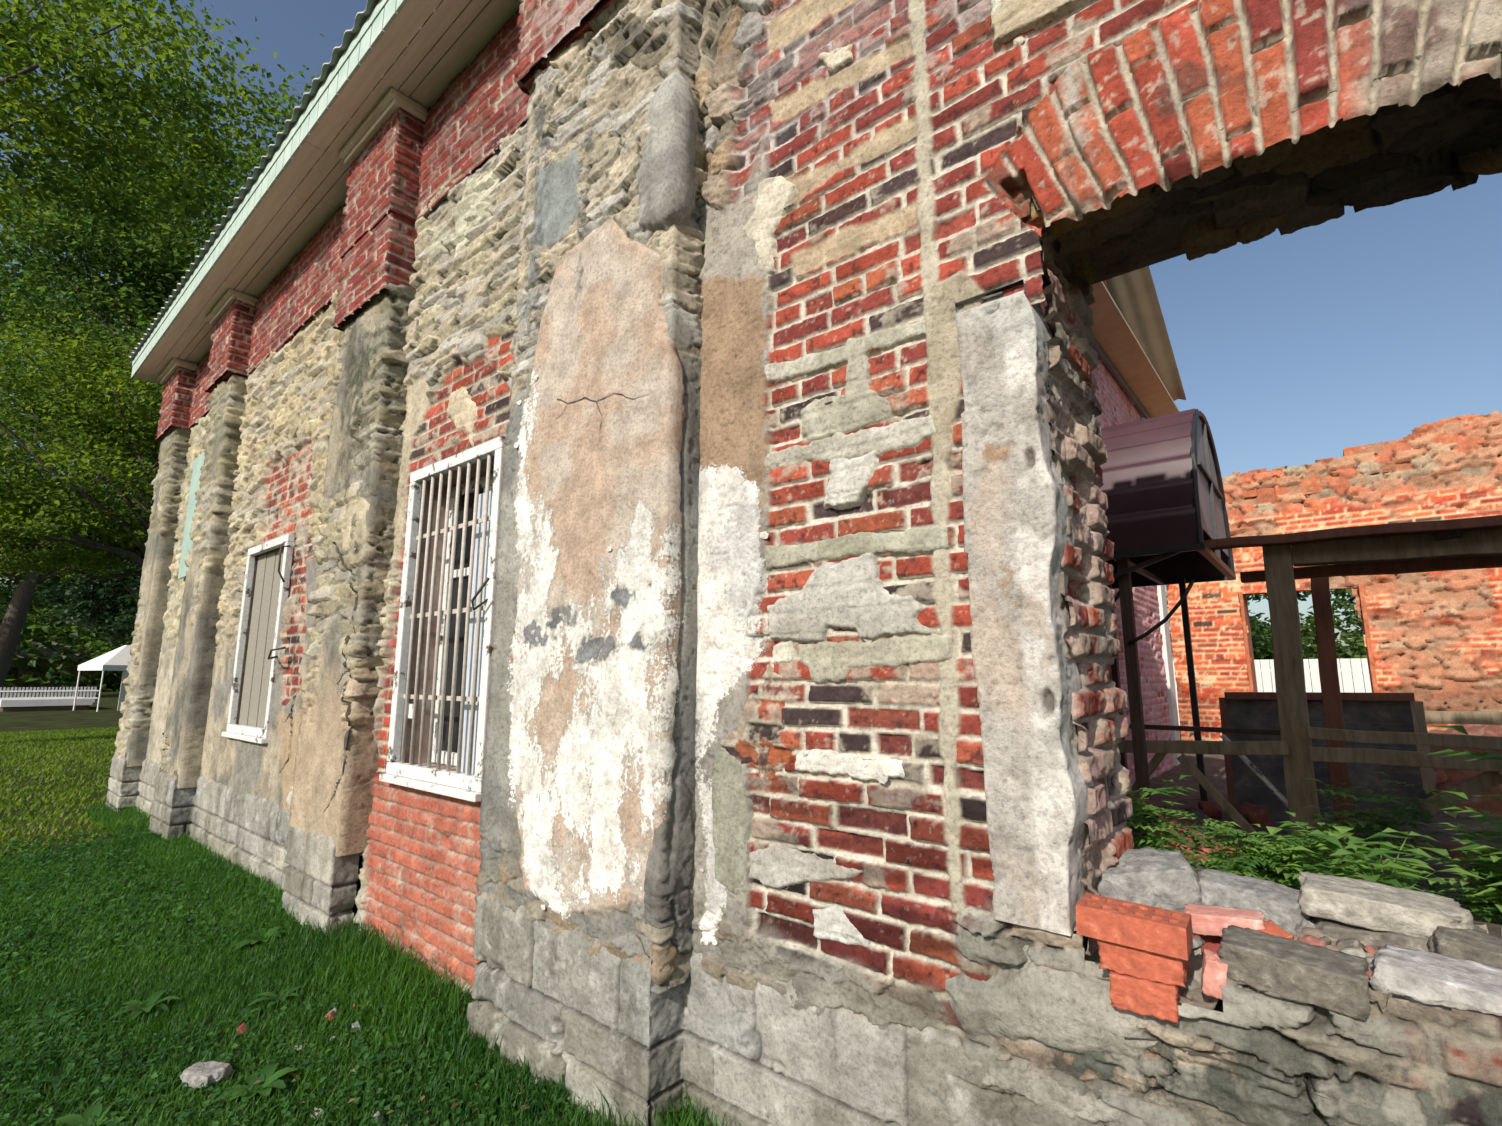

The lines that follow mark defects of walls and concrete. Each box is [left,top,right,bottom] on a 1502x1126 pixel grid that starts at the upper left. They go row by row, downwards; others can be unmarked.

crack [555,392,649,427]
crack [280,690,299,773]
crack [322,542,358,813]
flaking render [505,219,953,947]